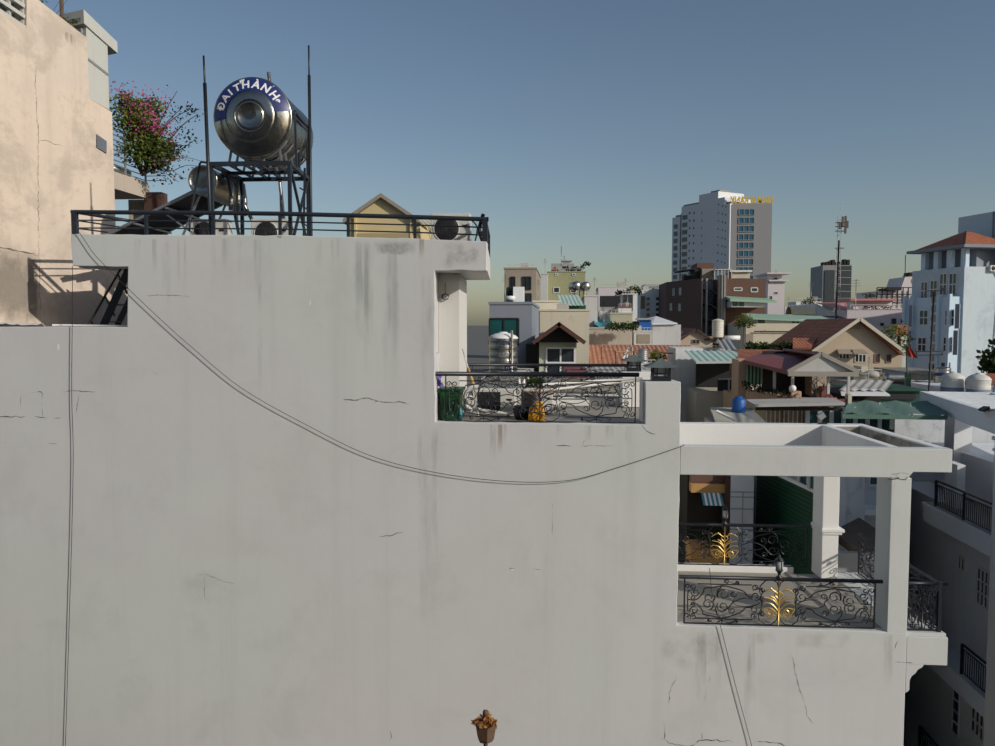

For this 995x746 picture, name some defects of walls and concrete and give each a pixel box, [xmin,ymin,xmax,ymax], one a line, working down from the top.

crack [0,390,91,418]